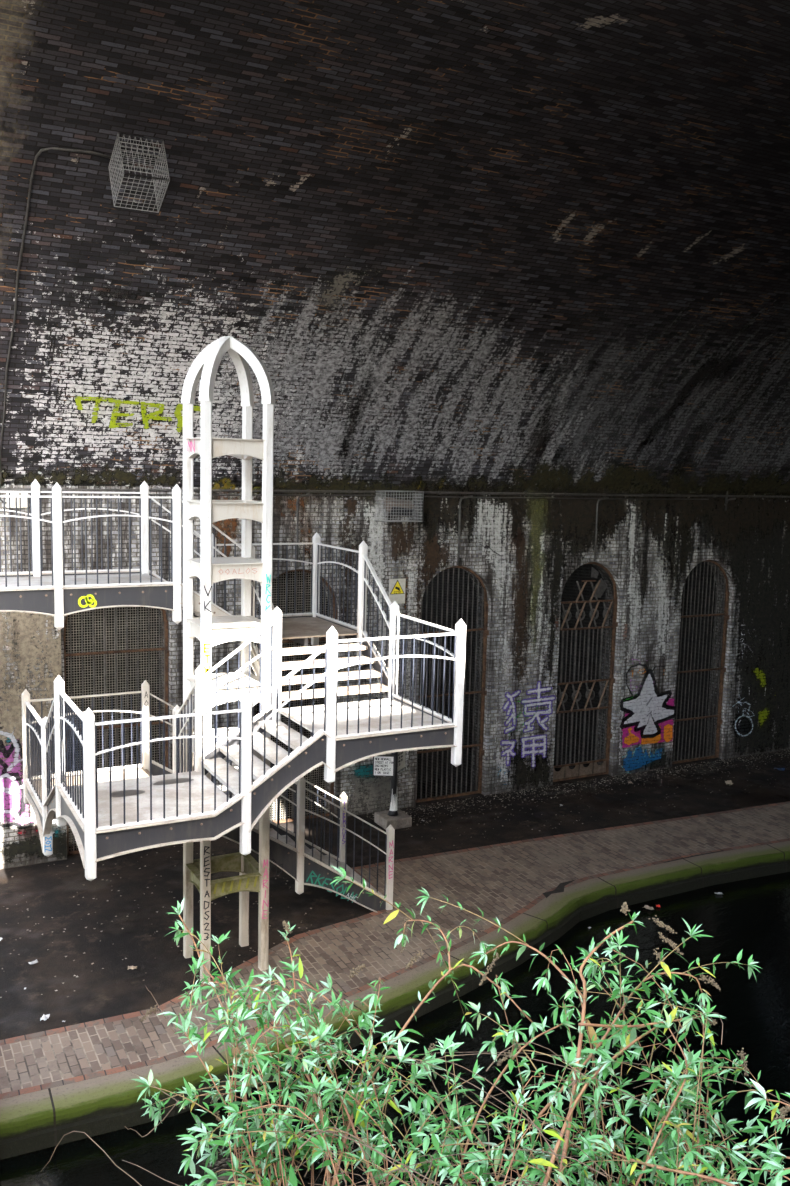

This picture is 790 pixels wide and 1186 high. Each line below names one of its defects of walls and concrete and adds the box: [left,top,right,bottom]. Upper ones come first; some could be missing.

damp [252,351,790,791]
damp [0,830,67,864]